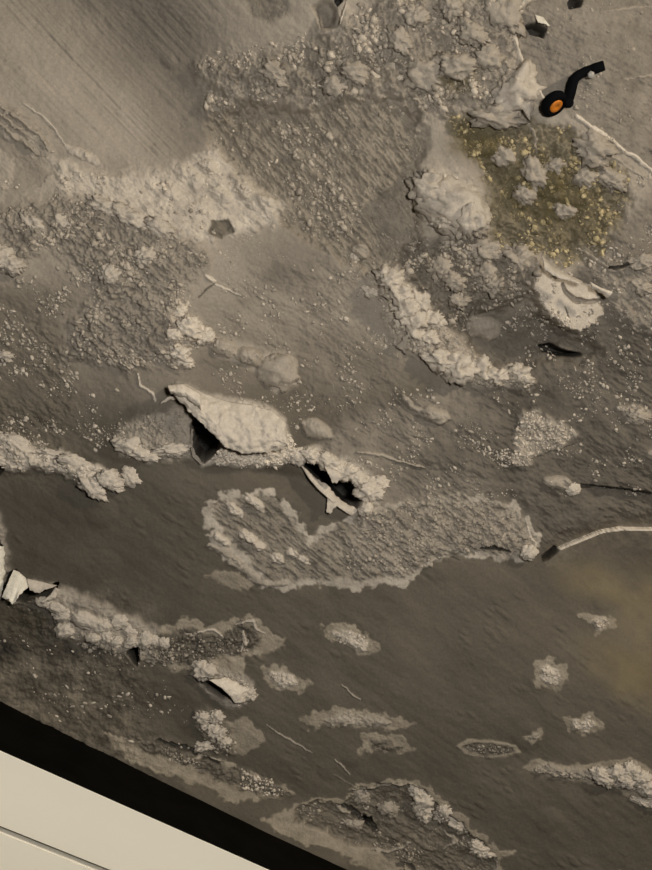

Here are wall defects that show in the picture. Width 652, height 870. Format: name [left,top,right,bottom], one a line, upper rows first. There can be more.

peeling [0,98,67,158]
flaking render [194,0,652,391]
flaking render [0,193,652,594]
crack [579,483,652,495]
flaking render [0,515,285,674]
peeling [321,623,381,656]
peeling [577,613,618,637]
peeling [260,664,313,695]
peeling [534,656,568,692]
flaking render [458,728,543,759]
flaking render [105,706,516,870]
flaking render [523,758,652,811]